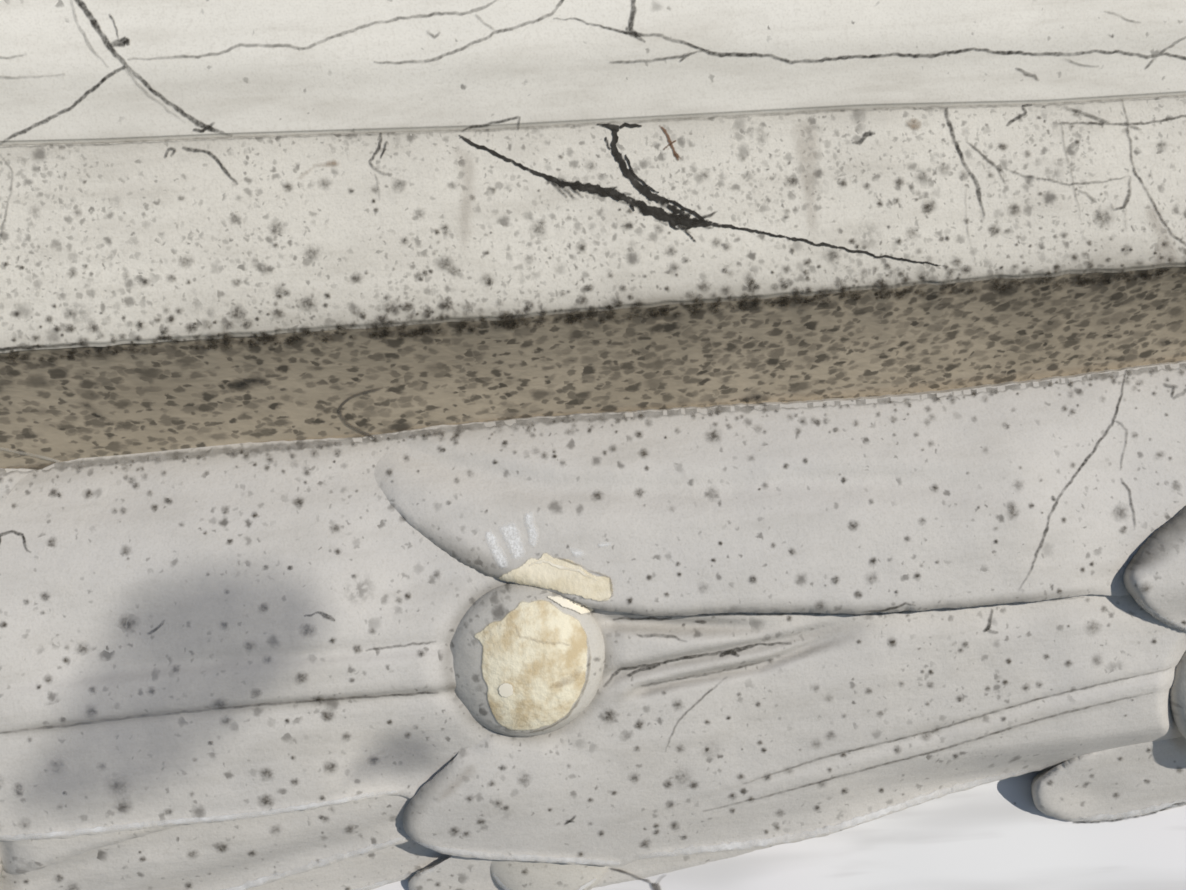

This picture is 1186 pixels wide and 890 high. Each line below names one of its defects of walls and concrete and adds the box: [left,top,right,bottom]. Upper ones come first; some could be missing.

crack [10,0,233,179]
crack [538,0,643,63]
crack [659,42,1186,75]
crack [459,117,945,266]
crack [945,113,1001,203]
crack [1120,154,1182,242]
mould [153,292,450,349]
mould [499,261,859,329]
mould [995,244,1171,290]
crack [1035,376,1125,556]
peeling [475,553,613,730]
crack [1076,803,1186,823]